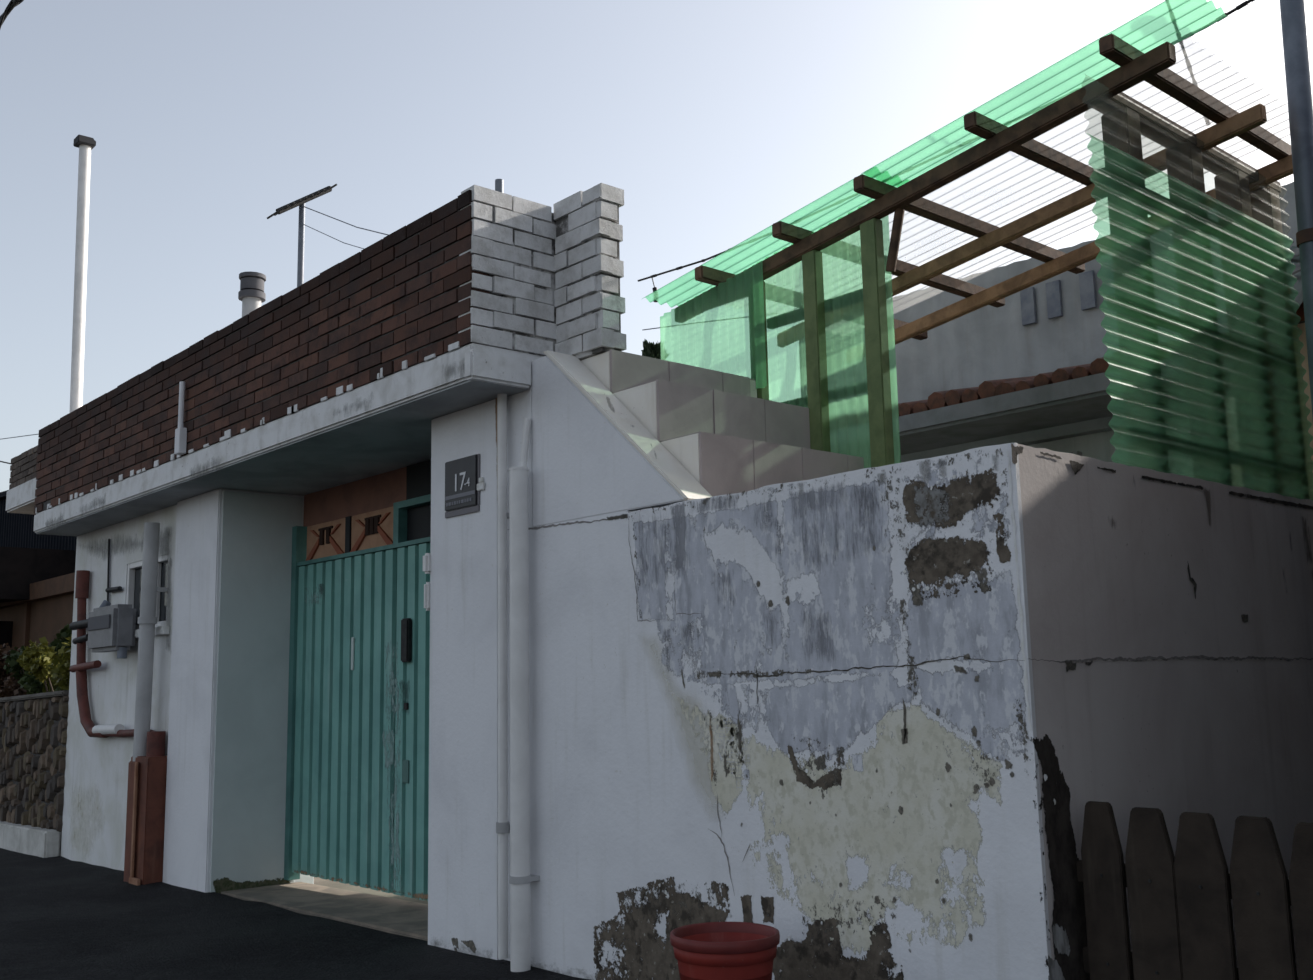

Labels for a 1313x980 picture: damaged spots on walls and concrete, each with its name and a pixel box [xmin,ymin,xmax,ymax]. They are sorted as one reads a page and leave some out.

flaking render [1040,452,1116,475]
flaking render [1142,476,1203,490]
flaking render [1229,491,1313,510]
crack [697,599,1313,744]
peeling [593,443,1090,980]